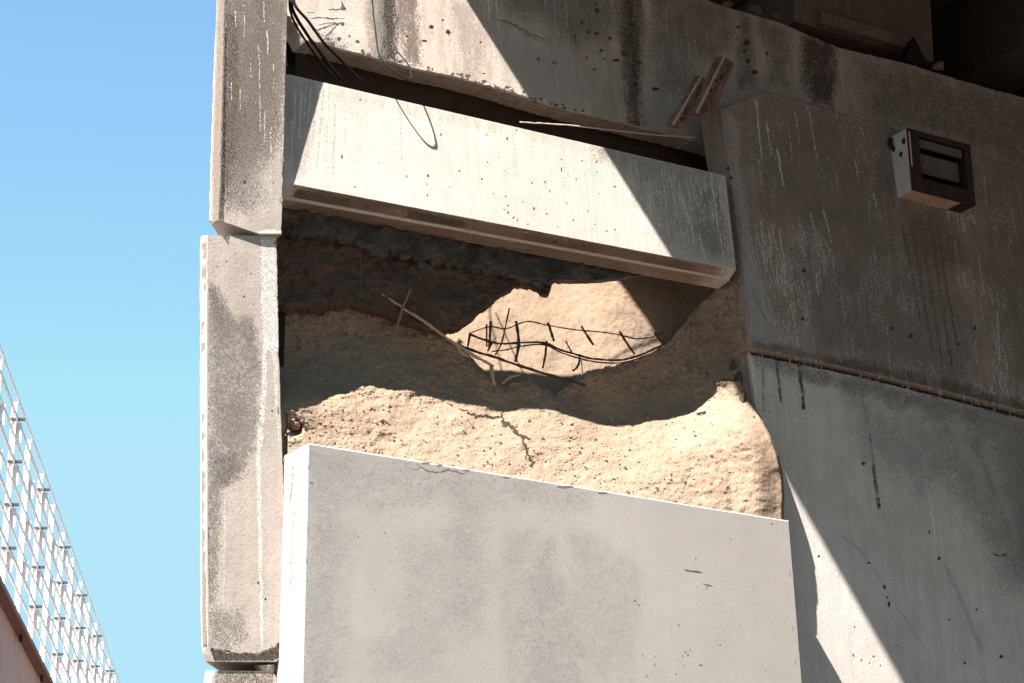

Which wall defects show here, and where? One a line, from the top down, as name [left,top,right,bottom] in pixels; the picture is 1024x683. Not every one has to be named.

spalling [258,197,647,287]
leakage [211,0,1024,683]
crack [459,408,534,468]